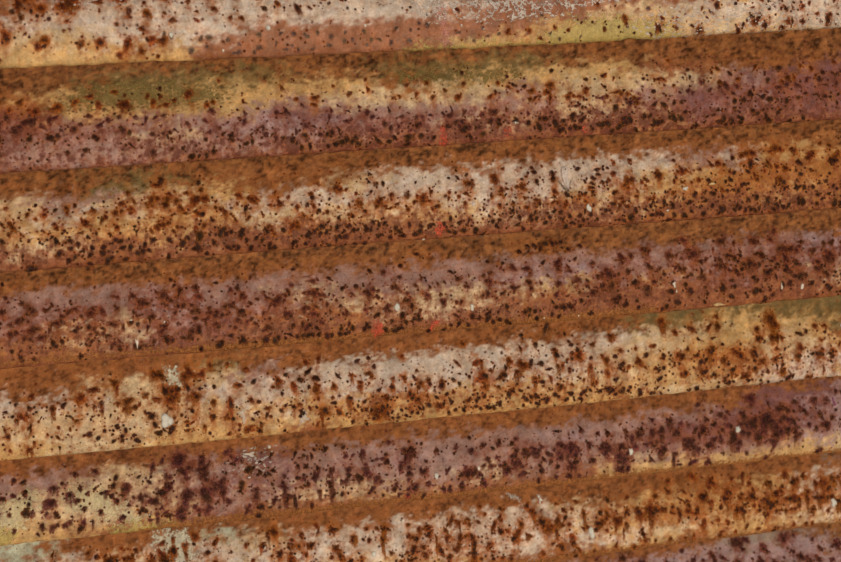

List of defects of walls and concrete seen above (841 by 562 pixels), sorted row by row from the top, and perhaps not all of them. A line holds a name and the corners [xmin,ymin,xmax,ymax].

corrosion [0,0,173,60]
corrosion [165,0,244,23]
corrosion [222,32,263,55]
corrosion [256,0,399,54]
corrosion [577,2,638,36]
corrosion [647,6,679,38]
corrosion [690,0,723,35]
corrosion [734,0,839,35]
corrosion [0,58,841,170]
corrosion [0,227,841,562]